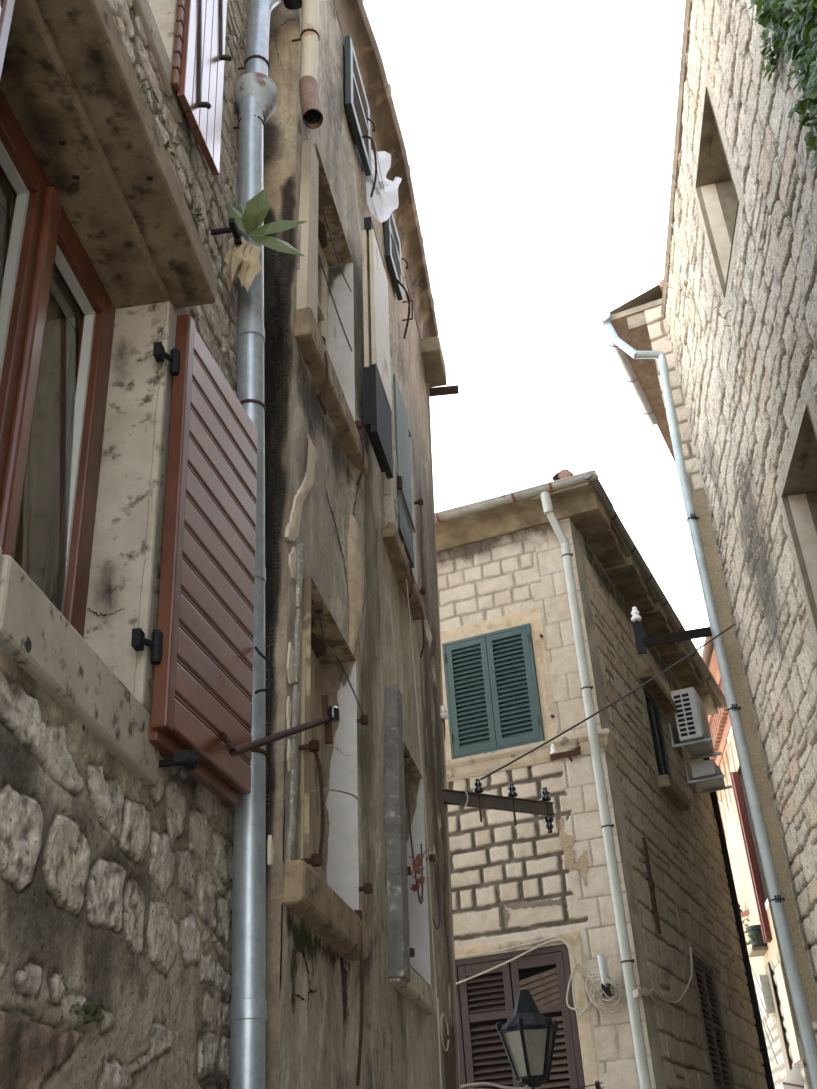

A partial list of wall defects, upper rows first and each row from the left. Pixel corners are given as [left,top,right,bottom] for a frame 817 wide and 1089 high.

leakage [2,53,73,193]
leakage [264,176,379,884]